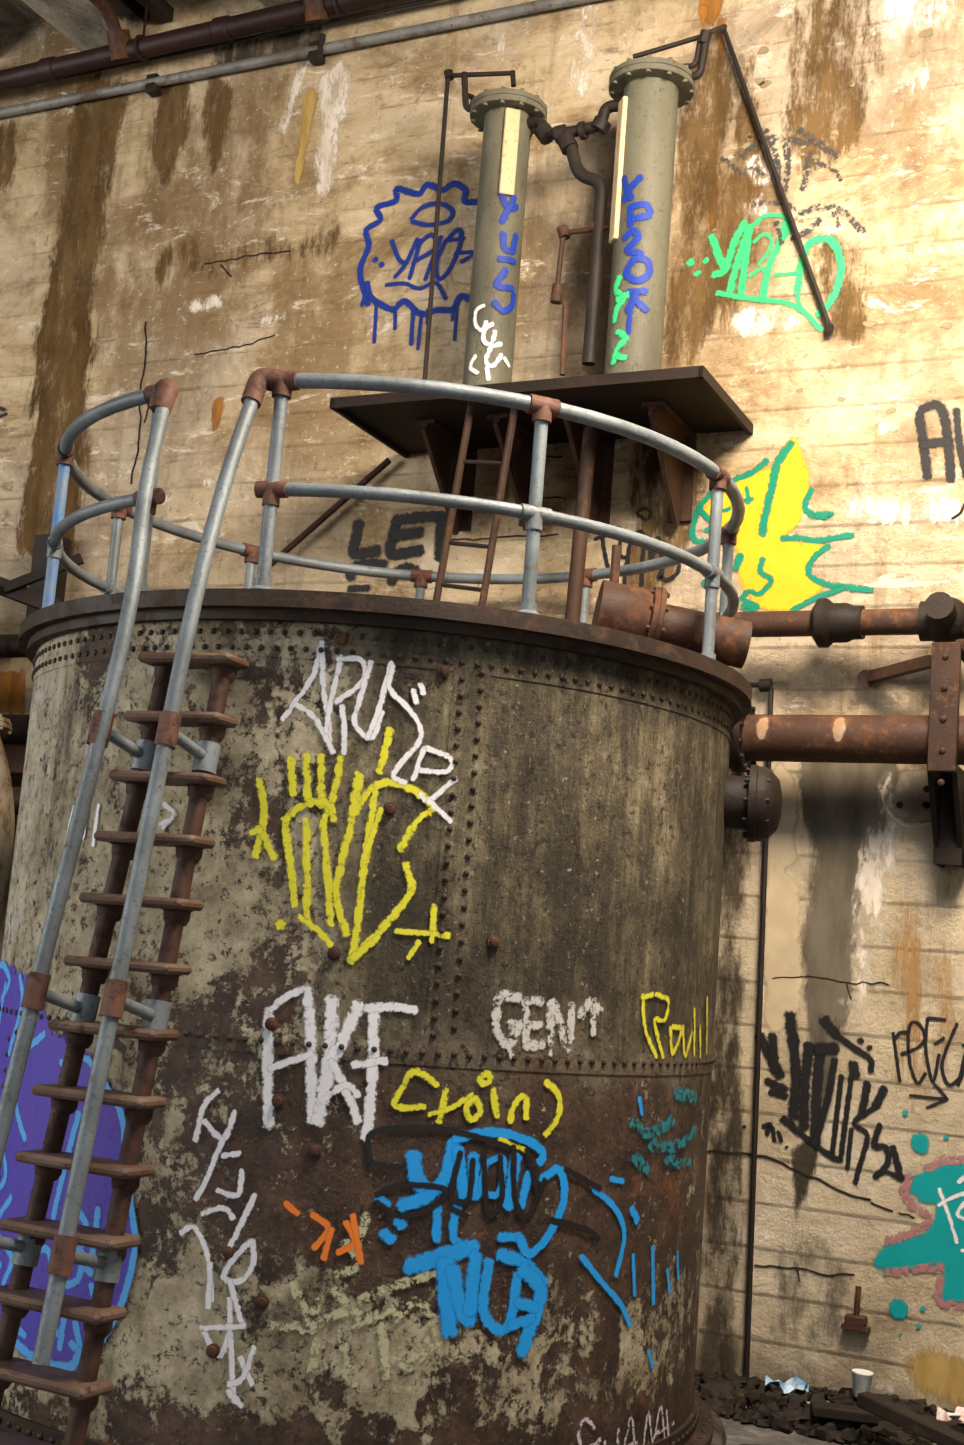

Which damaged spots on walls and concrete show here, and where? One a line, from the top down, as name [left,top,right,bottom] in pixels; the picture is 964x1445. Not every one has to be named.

leakage [17,73,129,557]
leakage [149,25,351,198]
leakage [663,46,763,367]
leakage [783,0,954,173]
rust [0,670,25,714]
leakage [799,762,900,1108]